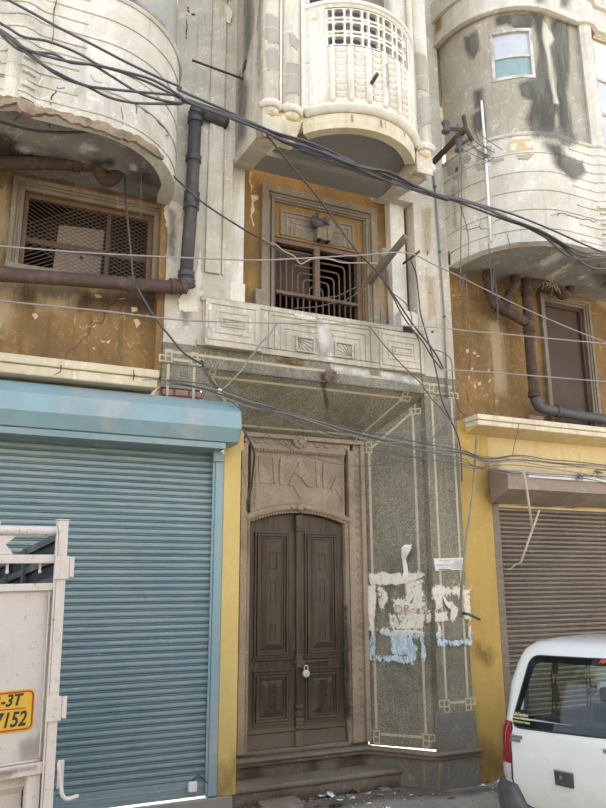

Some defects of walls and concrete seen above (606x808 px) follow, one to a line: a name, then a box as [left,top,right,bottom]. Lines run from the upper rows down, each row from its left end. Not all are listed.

water stain [496,13,585,179]
water stain [0,135,34,154]
spalling [0,95,164,160]
water stain [76,143,113,166]
peeling [164,201,183,235]
peeling [178,251,203,312]
crack [54,292,112,375]